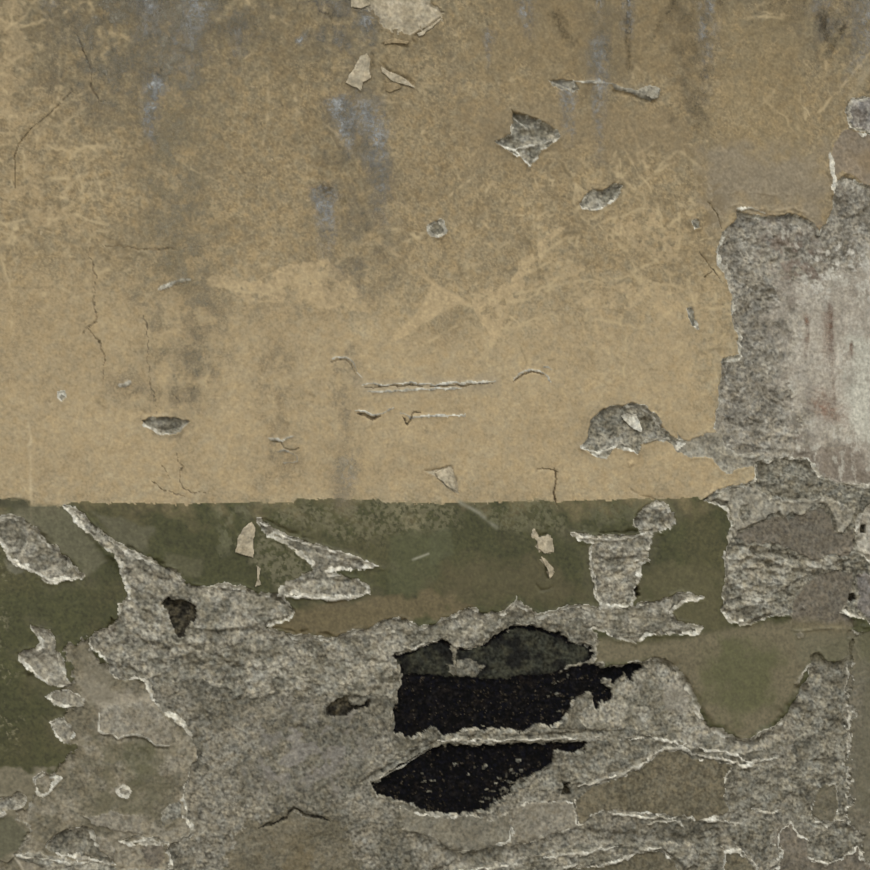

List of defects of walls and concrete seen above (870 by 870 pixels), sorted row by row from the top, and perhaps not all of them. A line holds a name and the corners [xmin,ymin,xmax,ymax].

peeling [349,0,444,45]
leakage [61,0,223,166]
peeling [346,54,371,91]
peeling [381,66,415,93]
peeling [549,80,661,102]
crack [14,91,73,189]
spalling [496,114,562,168]
crack [82,321,106,364]
peeling [580,97,870,630]
spalling [143,417,190,436]
spalling [0,500,870,870]